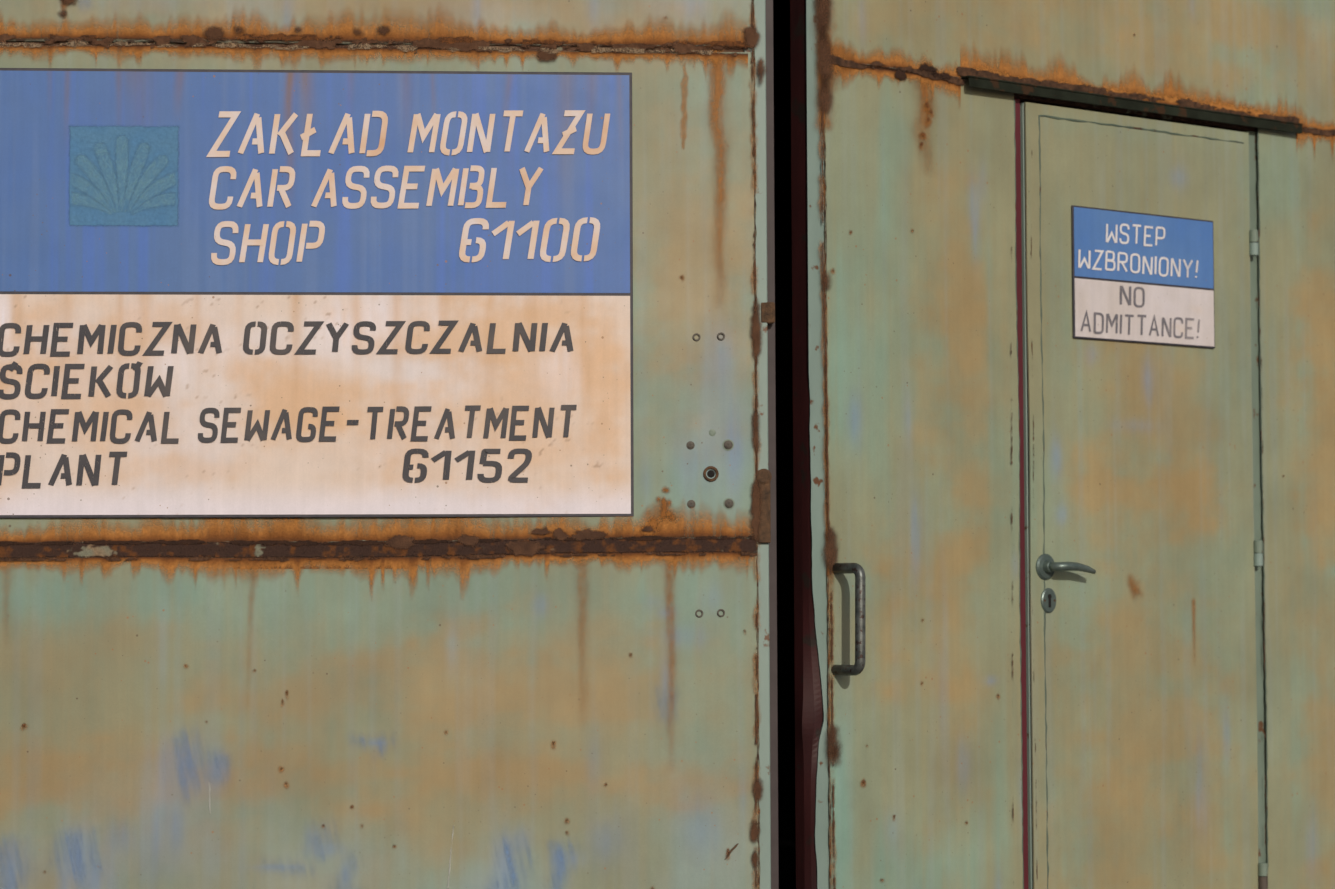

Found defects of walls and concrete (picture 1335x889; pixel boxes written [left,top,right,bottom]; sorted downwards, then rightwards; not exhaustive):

corrosion [0,0,766,245]
corrosion [816,0,1335,223]
corrosion [0,233,762,602]
corrosion [822,243,838,575]
corrosion [750,694,763,889]
corrosion [827,593,840,765]